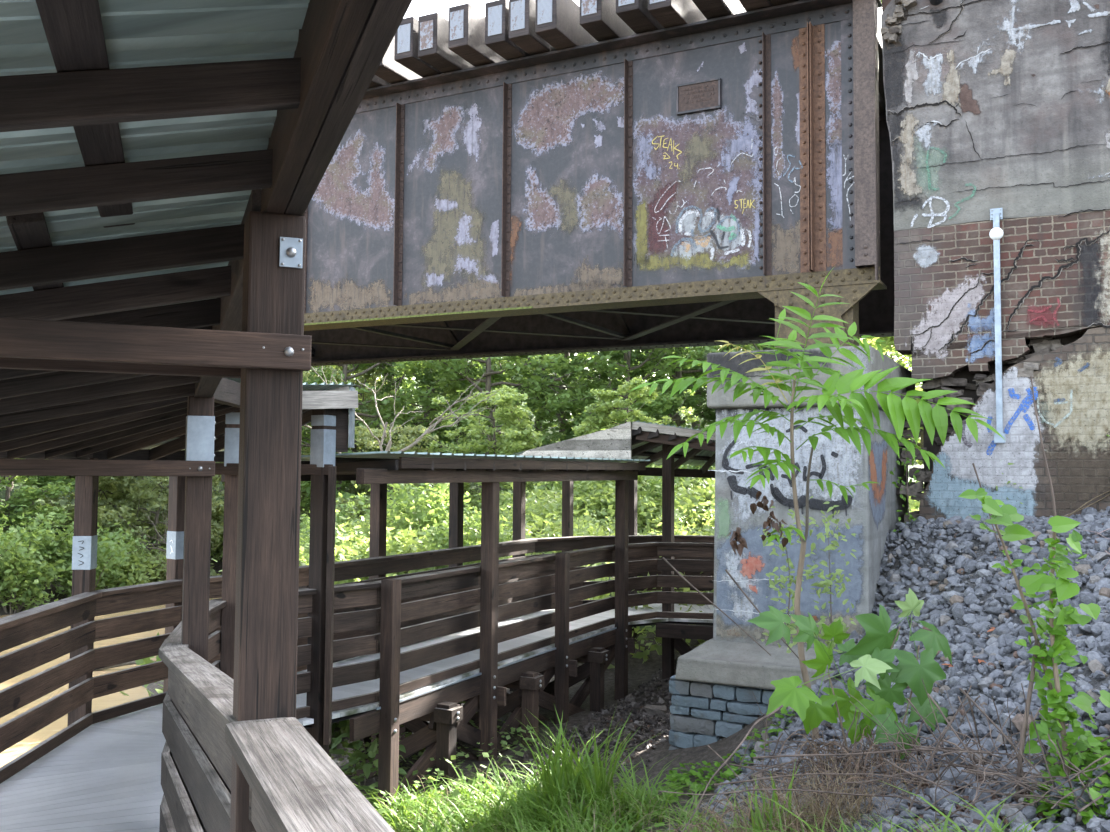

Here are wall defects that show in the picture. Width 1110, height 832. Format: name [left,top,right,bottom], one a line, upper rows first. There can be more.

spalling [880,0,917,50]
crack [883,0,990,69]
crack [1062,41,1110,54]
spalling [959,84,981,115]
crack [888,100,1106,169]
peeling [308,67,801,313]
crack [898,172,1110,356]